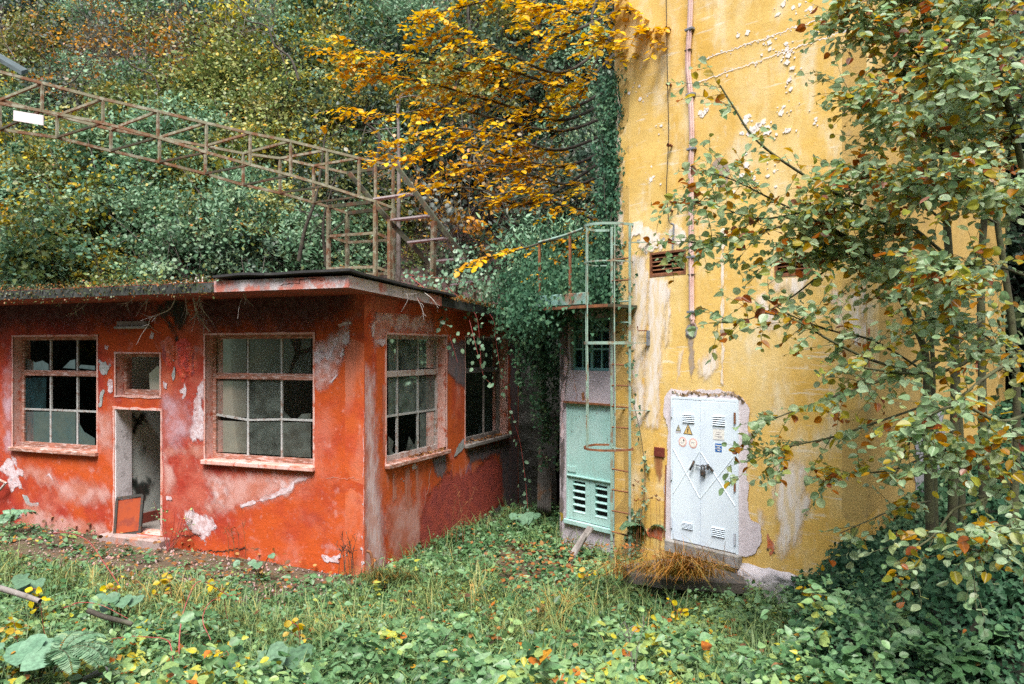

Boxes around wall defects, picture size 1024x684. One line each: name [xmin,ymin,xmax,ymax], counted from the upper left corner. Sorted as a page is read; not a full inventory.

peeling [698,0,846,139]
water stain [614,86,671,428]
peeling [314,321,351,390]
peeling [372,313,433,346]
peeling [163,366,204,440]
spalling [0,456,39,518]
peeling [185,510,217,542]
peeling [240,476,306,507]
water stain [773,462,810,557]
spalling [321,553,349,577]